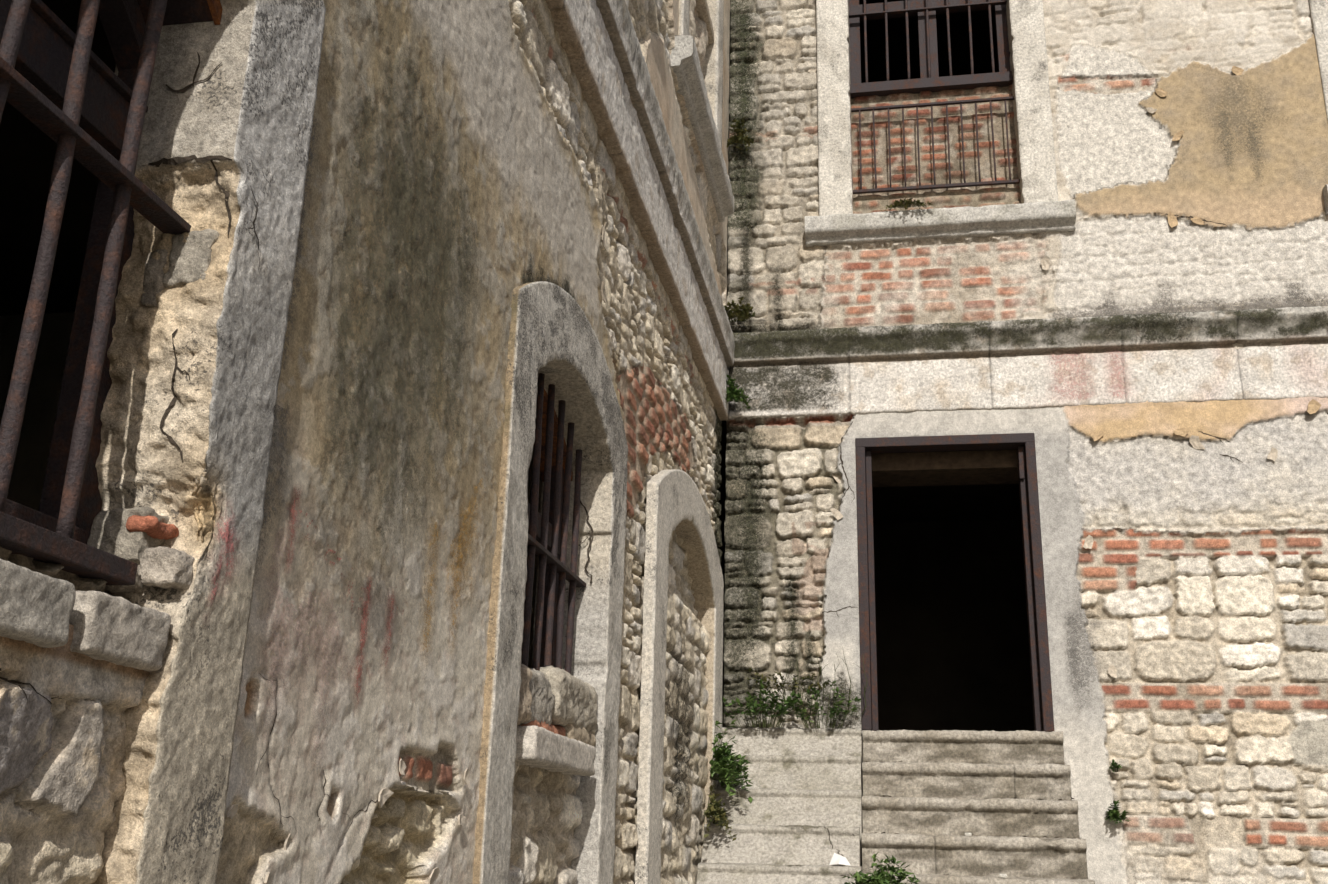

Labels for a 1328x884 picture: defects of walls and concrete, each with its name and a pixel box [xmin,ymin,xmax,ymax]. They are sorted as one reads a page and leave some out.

spalling [87,160,242,884]
crack [160,329,190,460]
damp [285,128,316,353]
damp [331,8,482,650]
flaking render [508,0,856,884]
damp [737,15,749,209]
damp [740,227,753,325]
damp [771,269,782,325]
peeling [625,0,1328,332]
crack [0,668,62,705]
flaking render [1061,397,1328,884]
flaking render [341,742,470,884]